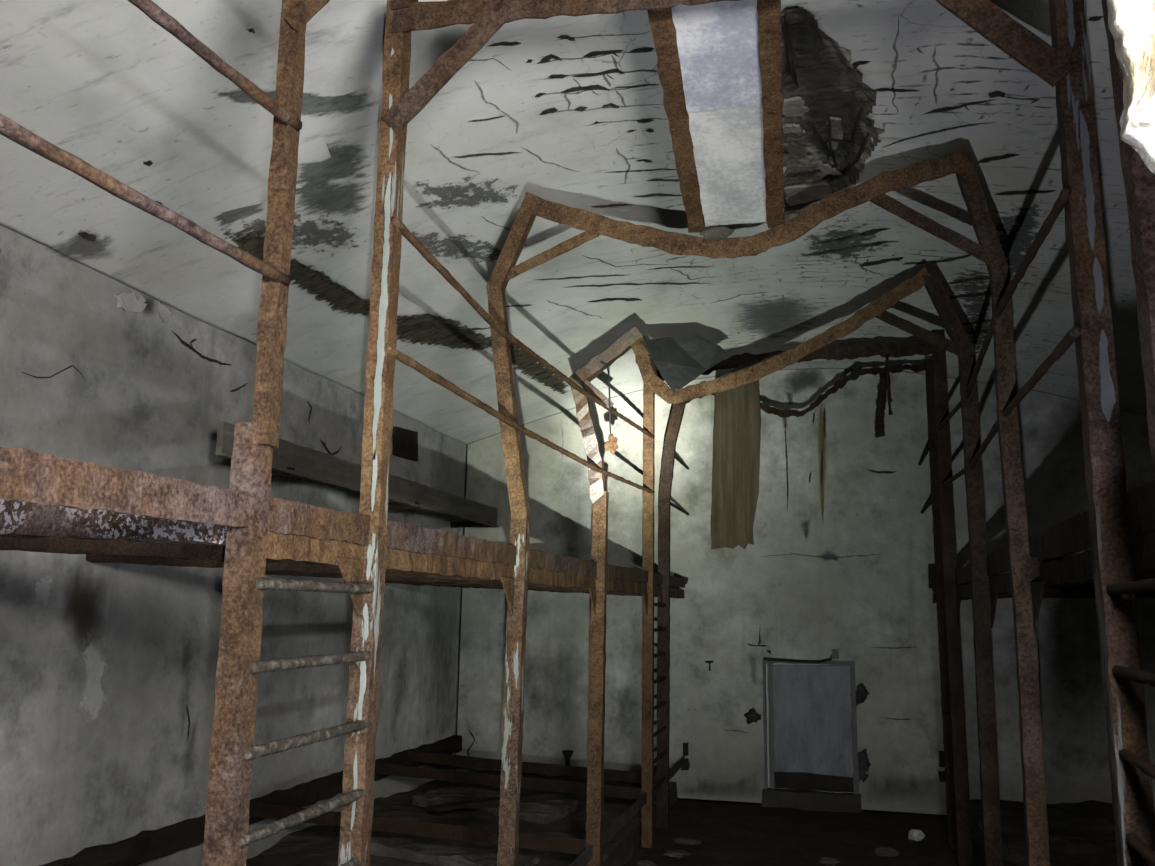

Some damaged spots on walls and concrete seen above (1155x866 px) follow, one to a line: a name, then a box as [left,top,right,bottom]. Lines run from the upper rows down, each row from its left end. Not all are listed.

water stain [219,90,276,104]
water stain [301,92,371,116]
crack [430,32,682,207]
spalling [780,6,885,222]
crack [847,16,1040,148]
crack [977,154,1019,163]
water stain [291,142,369,257]
water stain [215,203,266,239]
crack [172,331,248,392]
spalling [850,683,870,708]
spalling [744,707,762,724]
spalling [858,748,871,782]